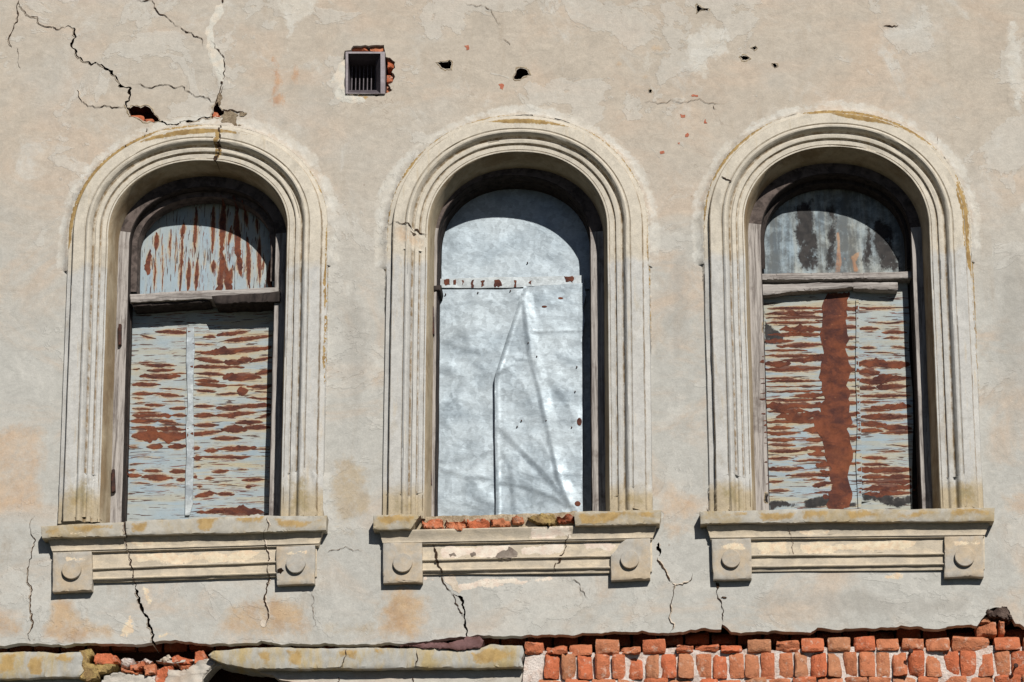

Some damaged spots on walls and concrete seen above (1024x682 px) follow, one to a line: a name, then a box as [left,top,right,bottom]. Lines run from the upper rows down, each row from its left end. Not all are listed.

crack [7,0,244,170]
peeling [330,46,395,104]
flaking render [499,66,531,90]
rust [144,195,272,291]
rust [126,330,273,516]
rust [760,292,918,509]
peeling [439,513,616,561]
crack [122,522,159,653]
crack [432,544,468,636]
peeling [424,574,553,593]
crack [656,543,727,630]
spalling [79,649,221,682]